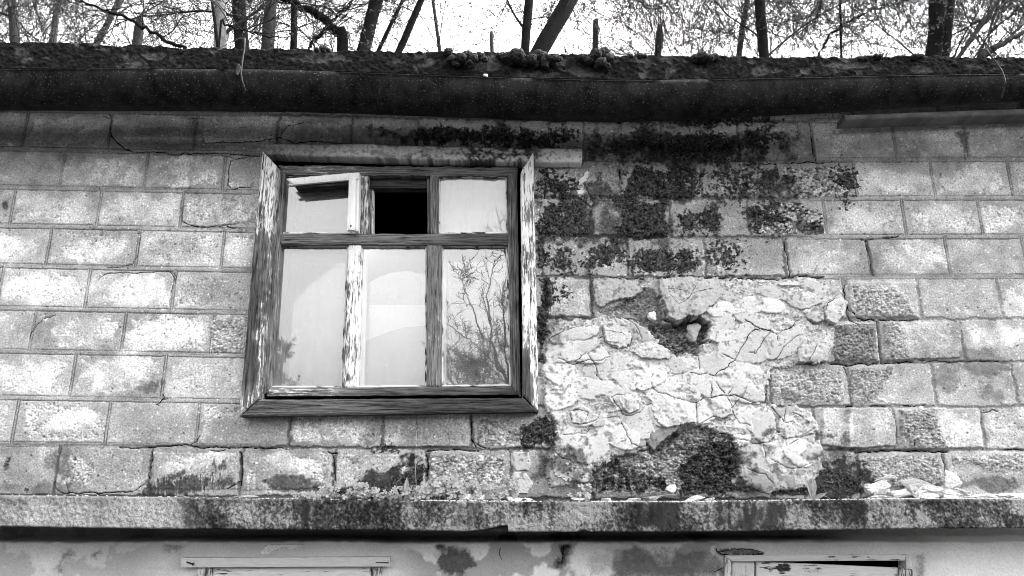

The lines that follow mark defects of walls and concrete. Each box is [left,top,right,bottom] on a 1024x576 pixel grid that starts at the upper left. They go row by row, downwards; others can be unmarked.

crack [104,116,347,190]
crack [549,243,998,480]
peeling [538,276,1024,495]
crack [54,436,287,495]
damp [625,502,683,530]
damp [436,544,477,576]
damp [554,544,571,569]